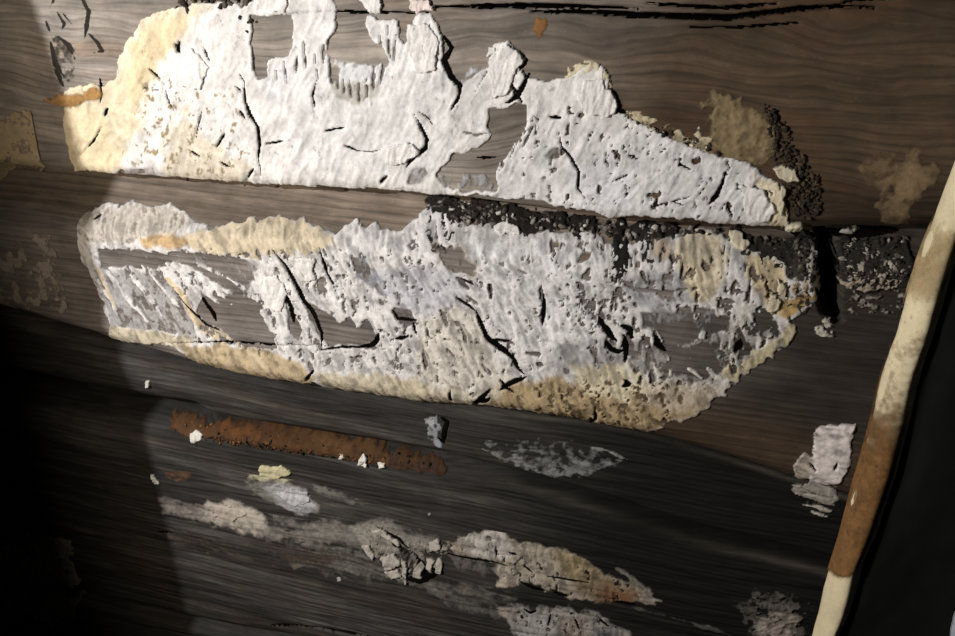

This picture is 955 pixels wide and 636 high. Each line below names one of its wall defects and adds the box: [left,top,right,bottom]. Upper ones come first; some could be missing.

crack [337,0,875,29]
leakage [45,0,955,432]
spalling [812,162,955,636]
peeling [190,430,203,443]
corrosion [170,407,447,476]
leakage [424,416,449,448]
spalling [361,521,450,585]